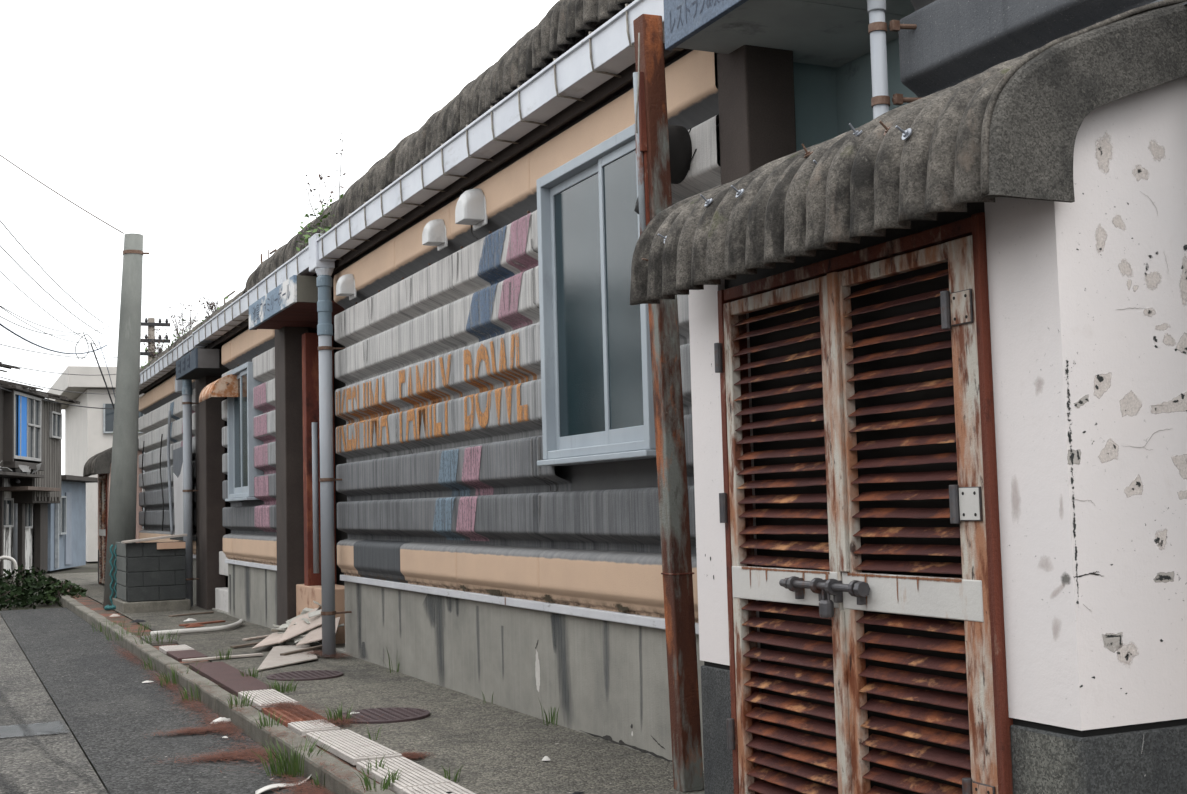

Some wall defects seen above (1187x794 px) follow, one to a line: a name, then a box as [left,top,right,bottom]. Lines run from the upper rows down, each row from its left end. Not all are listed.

peeling [1144,308,1187,354]
peeling [1074,373,1111,408]
peeling [1120,391,1187,417]
peeling [1099,438,1118,463]
peeling [1125,475,1143,497]
peeling [1172,454,1187,499]
peeling [1154,529,1167,549]
rust [847,572,962,605]
peeling [1154,572,1174,583]
peeling [1103,632,1137,663]